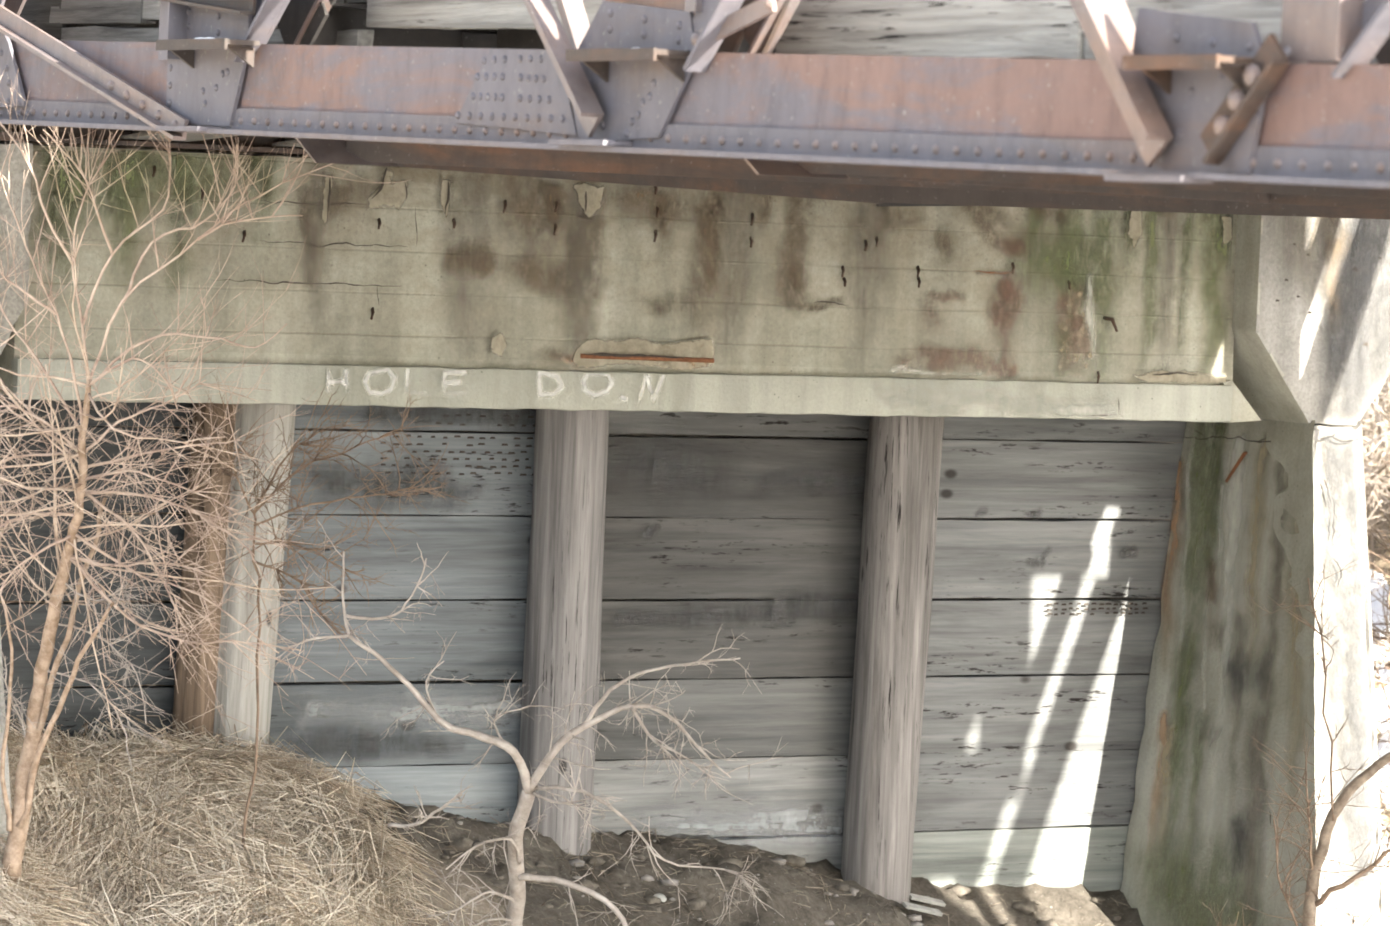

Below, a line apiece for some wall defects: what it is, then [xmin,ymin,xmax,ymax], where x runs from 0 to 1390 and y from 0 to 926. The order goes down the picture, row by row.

leakage [446,237,494,314]
leakage [509,182,601,295]
leakage [781,197,806,294]
leakage [1032,208,1193,336]
leakage [1205,423,1301,733]
leakage [1161,647,1263,883]